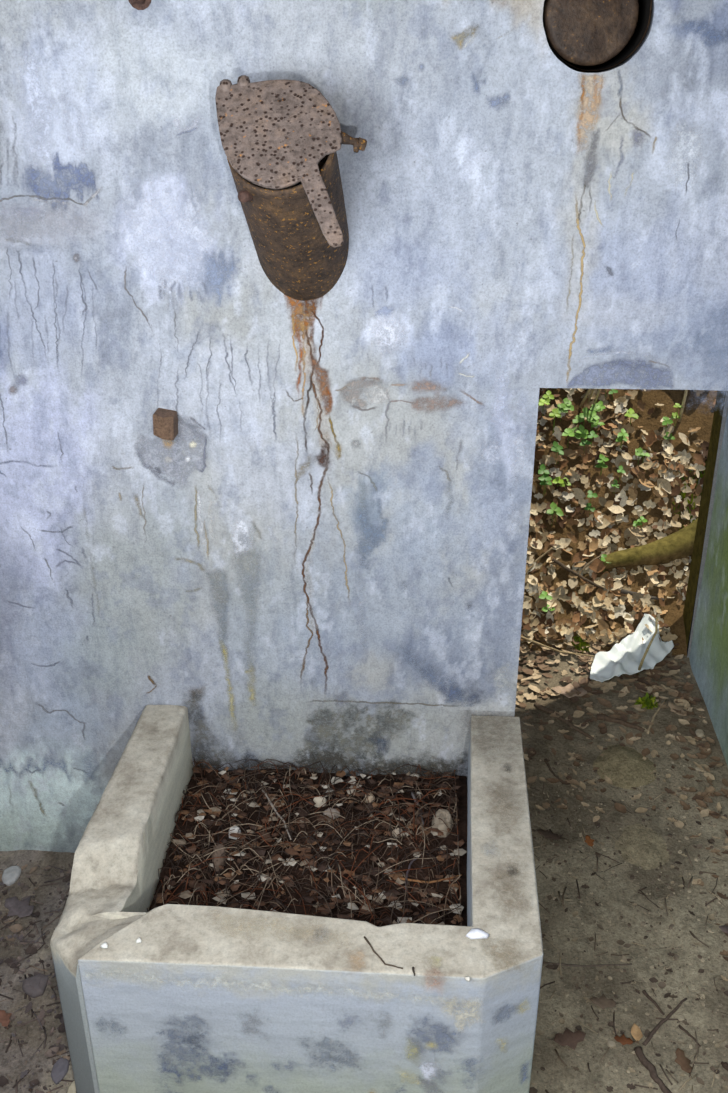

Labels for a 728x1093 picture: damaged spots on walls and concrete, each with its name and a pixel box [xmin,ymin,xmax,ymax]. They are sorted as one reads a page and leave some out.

rust [577,75,603,143]
crack [124,271,148,321]
rust [567,219,585,374]
crack [0,398,64,474]
spalling [137,416,206,483]
rust [284,294,350,677]
spalling [336,377,389,429]
water stain [189,691,463,776]
water stain [159,1016,235,1082]
water stain [408,1002,475,1093]